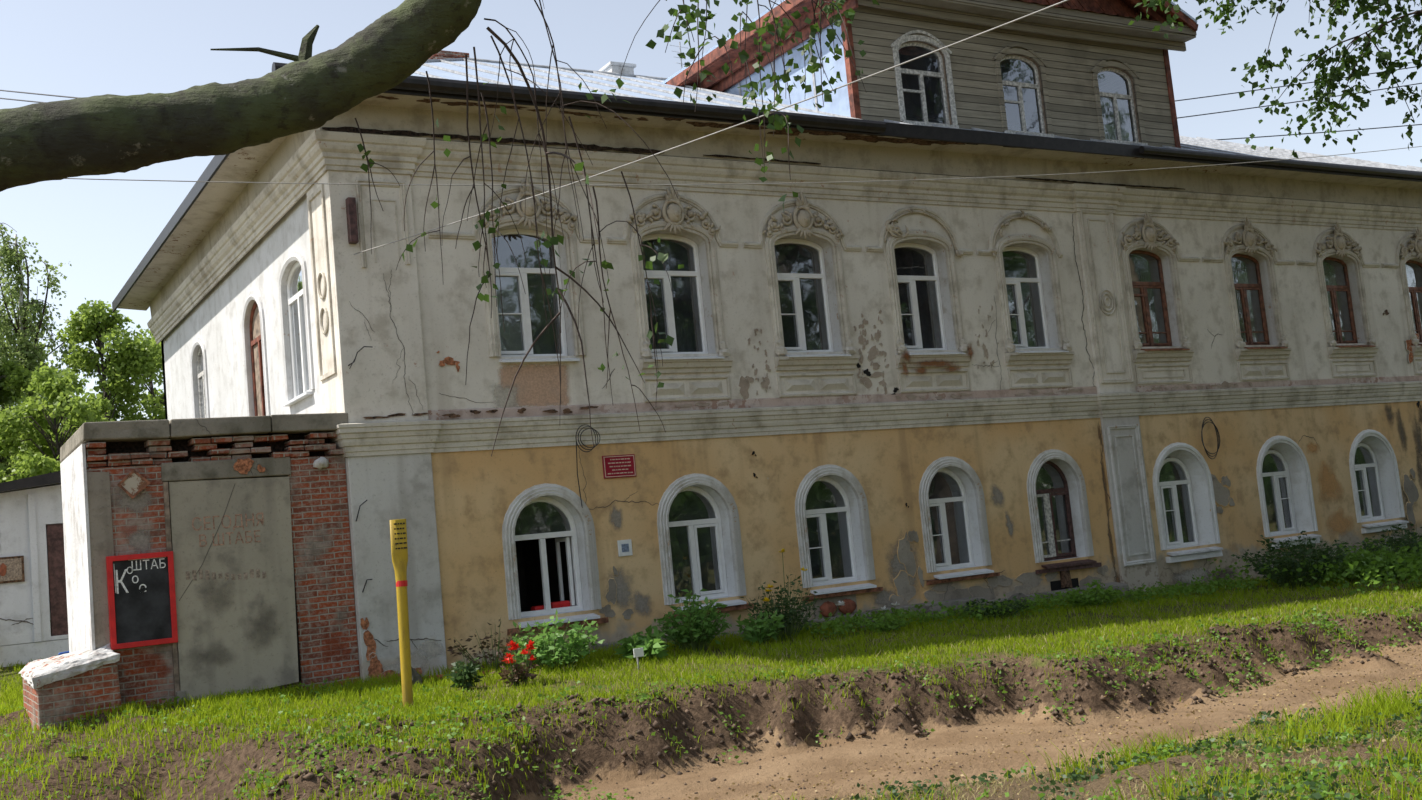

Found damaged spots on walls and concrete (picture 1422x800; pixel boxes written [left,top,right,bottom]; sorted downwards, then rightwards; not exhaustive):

flaking render [853,309,972,400]
spalling [360,617,423,679]